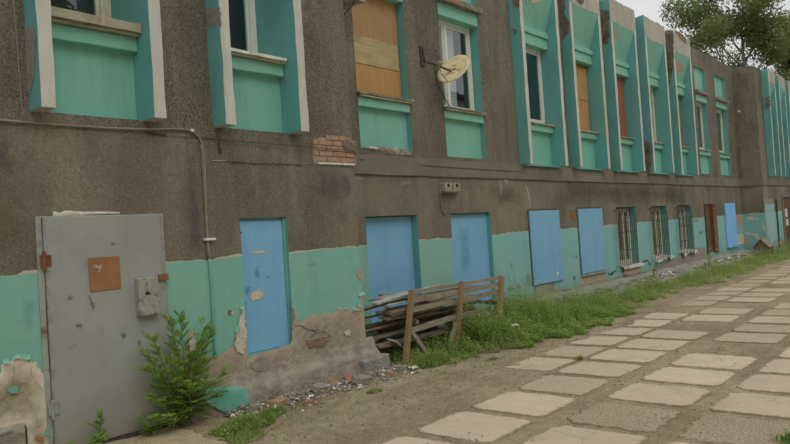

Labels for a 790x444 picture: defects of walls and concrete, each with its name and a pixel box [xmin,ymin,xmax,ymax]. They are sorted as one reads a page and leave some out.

peeling [559,0,570,40]
peeling [600,10,617,45]
crack [212,159,312,167]
spalling [312,135,412,166]
peeling [170,287,366,417]
peeling [0,353,51,444]